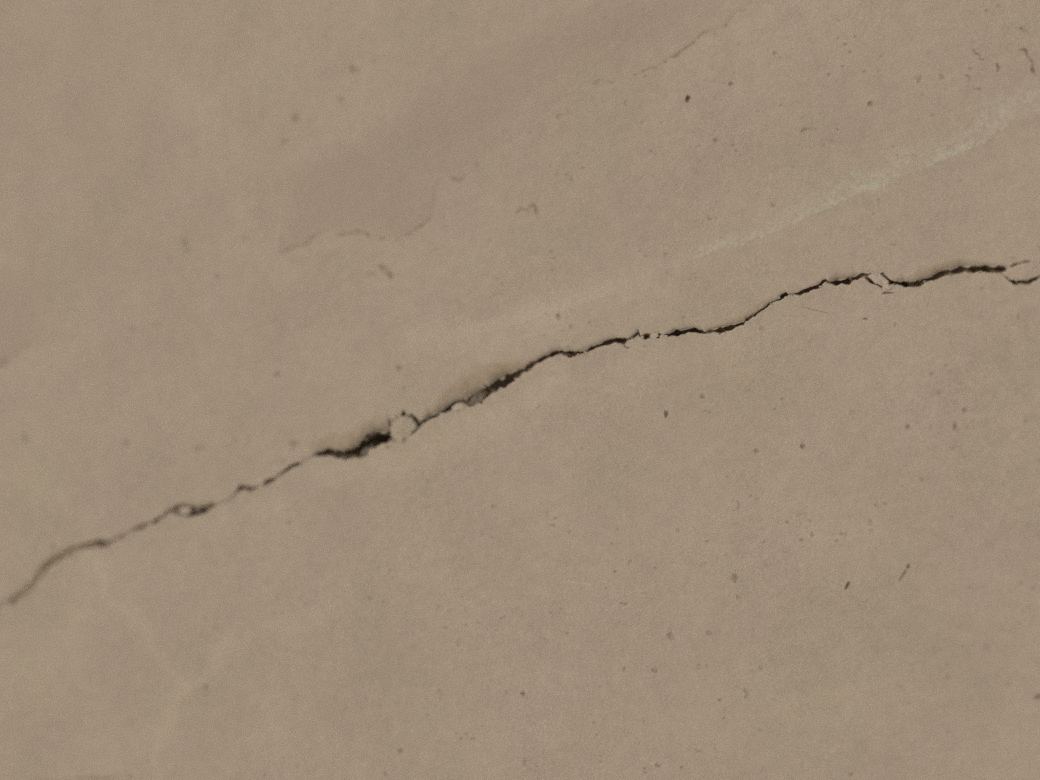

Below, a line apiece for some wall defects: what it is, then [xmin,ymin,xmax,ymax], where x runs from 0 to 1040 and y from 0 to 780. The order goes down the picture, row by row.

crack [0,260,1040,608]